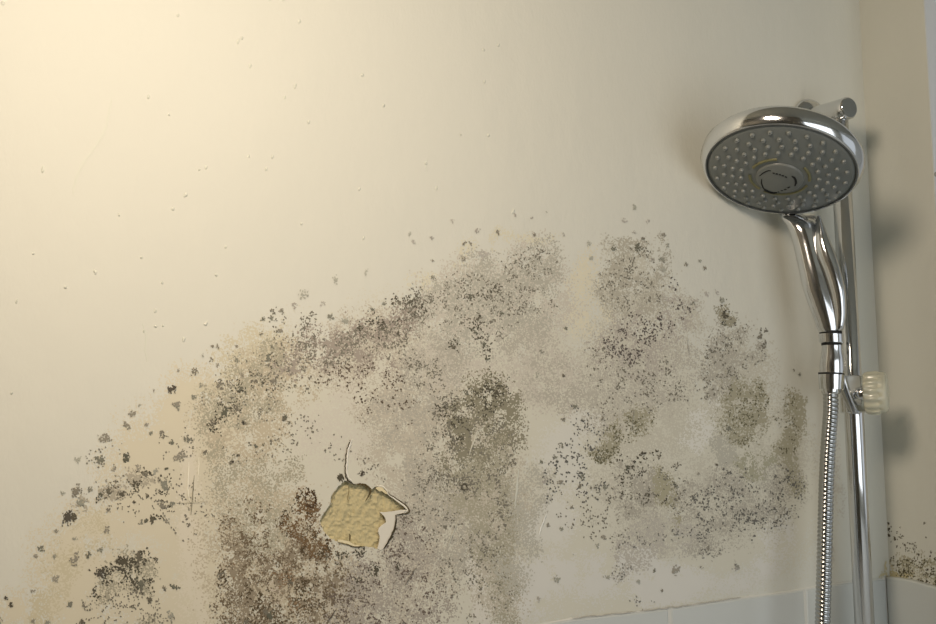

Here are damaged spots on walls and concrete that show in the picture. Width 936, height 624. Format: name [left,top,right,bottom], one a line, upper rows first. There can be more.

leakage [0,220,821,624]
flaking render [320,439,408,550]
leakage [879,522,936,585]